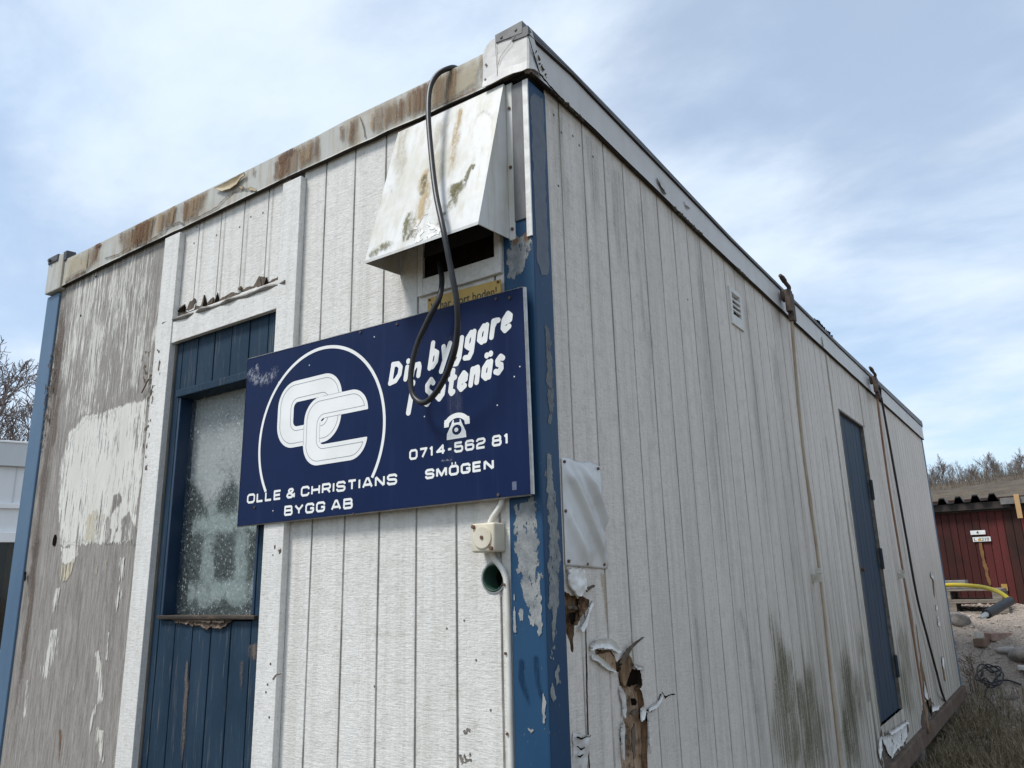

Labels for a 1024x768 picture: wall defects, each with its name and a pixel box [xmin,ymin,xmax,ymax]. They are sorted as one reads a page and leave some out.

rust [371,69,475,129]
rust [340,117,356,142]
rust [273,139,318,179]
rust [119,192,206,253]
leakage [402,170,429,239]
leakage [443,165,472,215]
rust [69,242,101,281]
peeling [506,234,532,279]
leakage [21,310,65,664]
peeling [61,544,78,564]
peeling [513,453,652,760]
peeling [878,720,909,760]